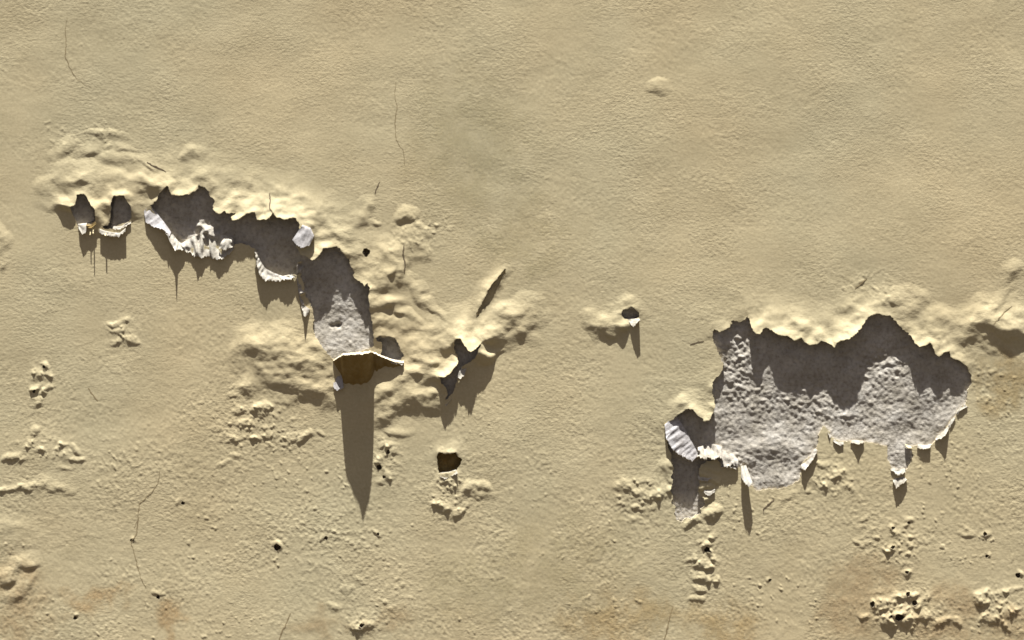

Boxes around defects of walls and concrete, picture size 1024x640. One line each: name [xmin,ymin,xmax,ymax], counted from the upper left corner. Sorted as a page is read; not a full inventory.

peeling [31,141,526,417]
spalling [416,438,499,522]
peeling [577,292,651,342]
peeling [648,271,1005,522]